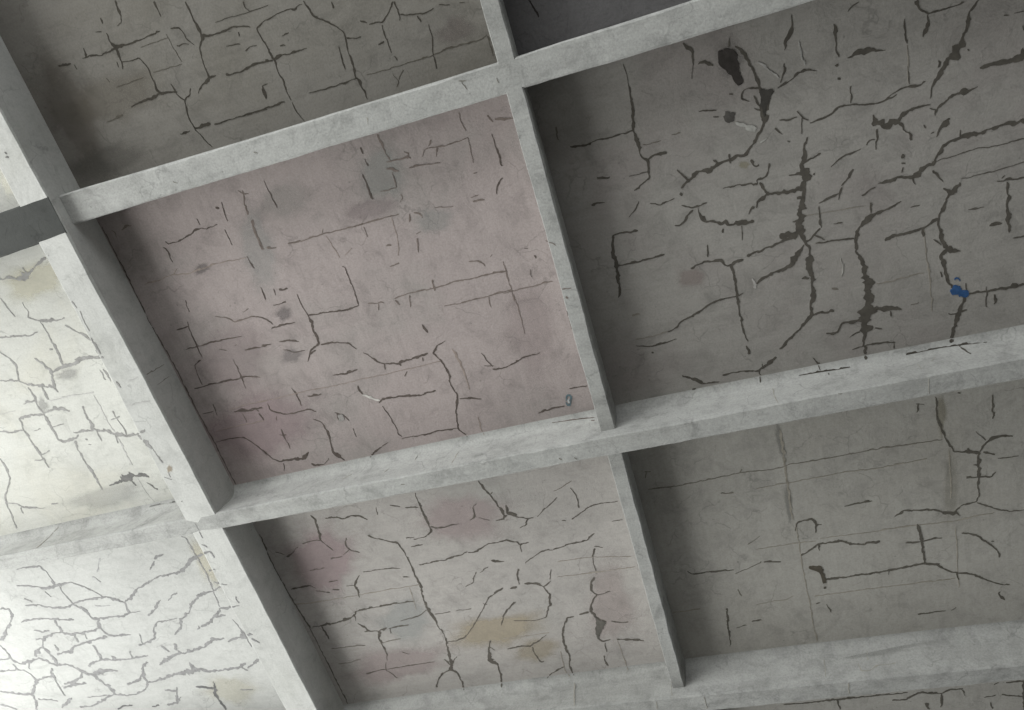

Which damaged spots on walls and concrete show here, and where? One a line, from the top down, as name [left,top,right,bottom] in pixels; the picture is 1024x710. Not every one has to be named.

crack [0,0,644,710]
spalling [718,48,743,86]
crack [555,0,1024,403]
crack [645,392,1024,710]